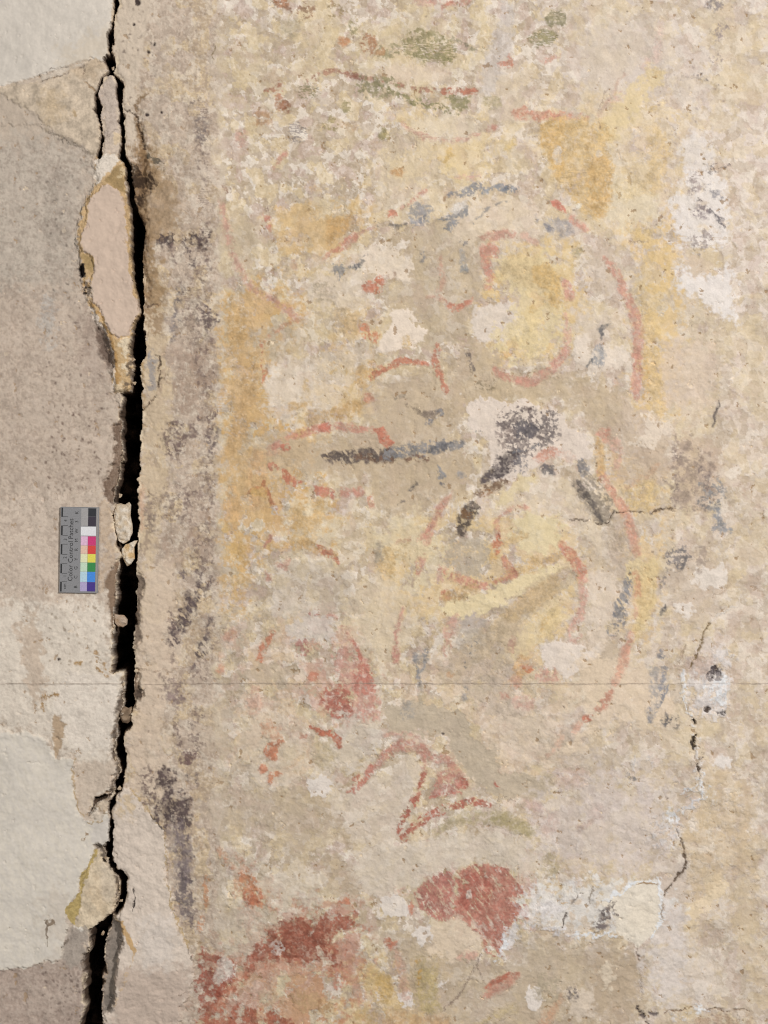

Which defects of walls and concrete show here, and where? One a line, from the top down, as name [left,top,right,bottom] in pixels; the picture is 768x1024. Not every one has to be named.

flaking render [0,0,145,394]
crack [79,0,188,1024]
crack [677,583,739,669]
crack [682,694,702,780]
peeling [0,713,203,1024]
flaking render [573,875,666,949]
crack [654,820,688,921]
crack [635,945,757,1024]